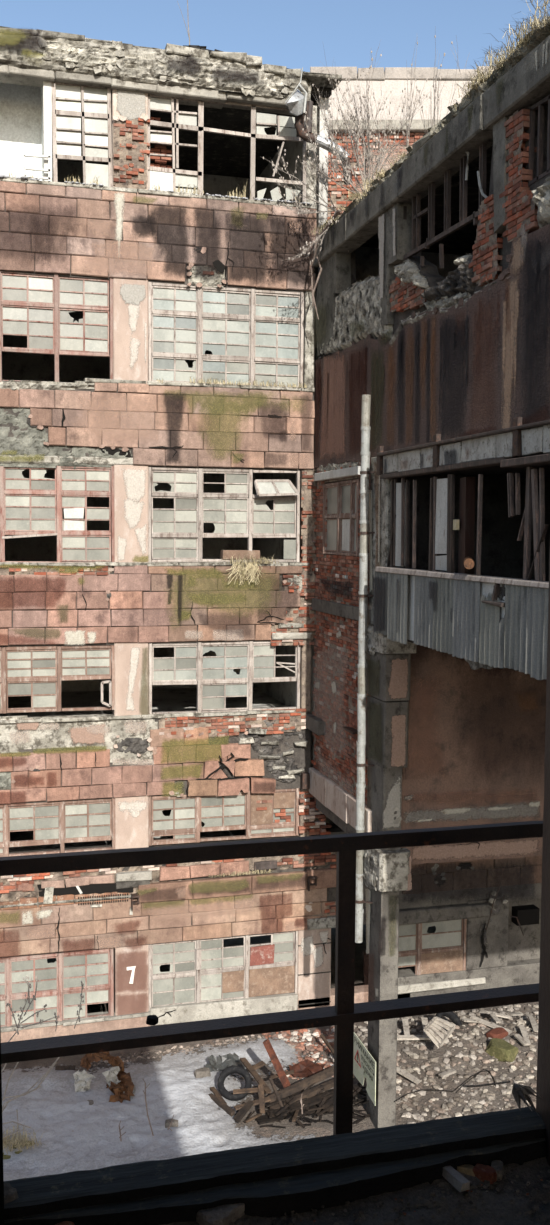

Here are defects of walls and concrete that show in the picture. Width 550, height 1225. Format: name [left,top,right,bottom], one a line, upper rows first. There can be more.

spalling [477,17,550,96]
spalling [39,38,292,189]
spalling [423,102,463,138]
spalling [367,145,413,196]
water stain [115,193,311,283]
flaking render [378,109,539,345]
corrosion [386,317,436,445]
water stain [165,395,183,461]
spalling [0,407,147,576]
water stain [165,568,258,621]
flaking render [270,458,361,646]
crack [187,753,250,797]